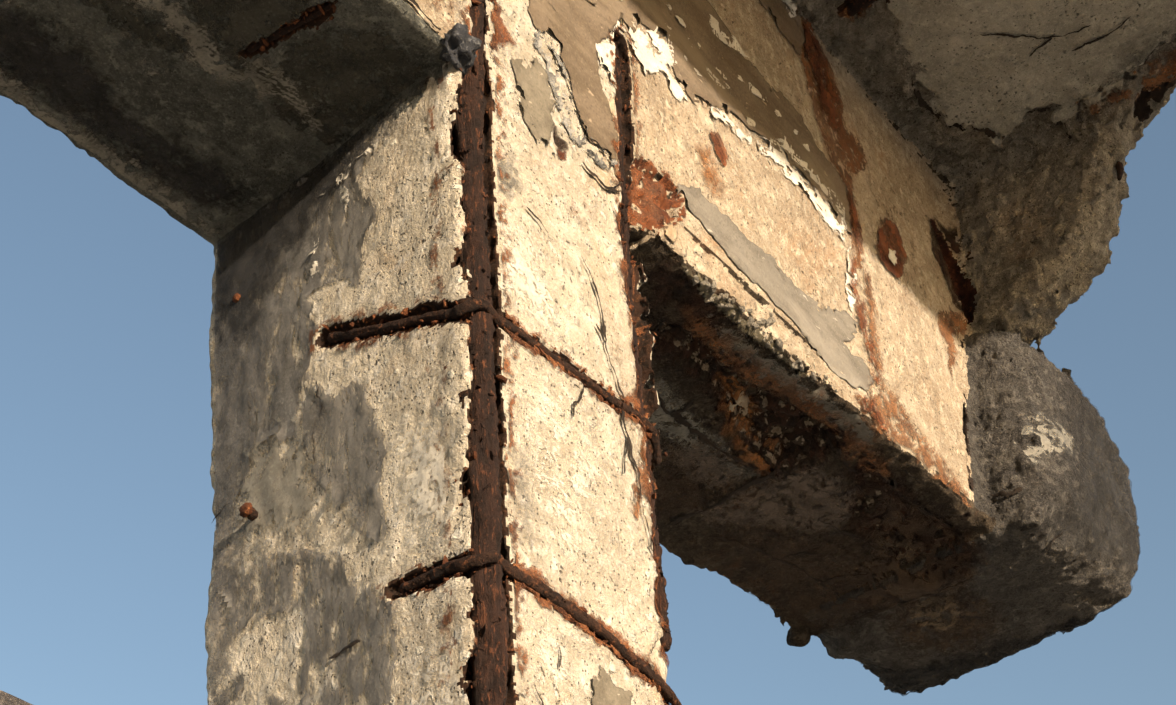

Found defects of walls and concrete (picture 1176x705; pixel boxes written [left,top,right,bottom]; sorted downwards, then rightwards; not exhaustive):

spalling [837,0,890,17]
crack [980,16,1131,57]
spalling [1133,78,1176,122]
rust [623,157,686,236]
rust [699,131,729,192]
rust [796,11,974,508]
spalling [930,219,977,324]
leakage [0,0,426,705]
peeling [528,0,874,669]
rust [628,261,849,479]
leakage [415,652,453,705]
rust [513,557,672,705]